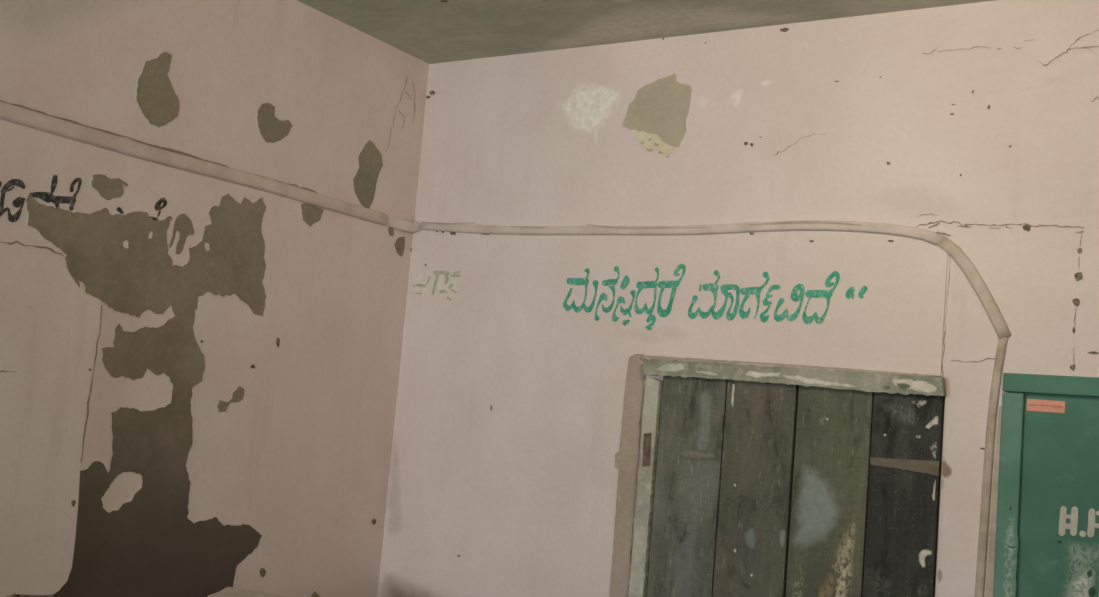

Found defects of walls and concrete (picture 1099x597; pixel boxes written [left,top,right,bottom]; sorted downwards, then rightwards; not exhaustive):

crack [923,30,1099,66]
peeling [135,50,181,129]
peeling [256,101,293,145]
leakage [548,77,626,146]
flaking render [621,73,694,158]
peeling [352,139,384,209]
peeling [300,202,325,228]
flaking render [25,172,267,597]